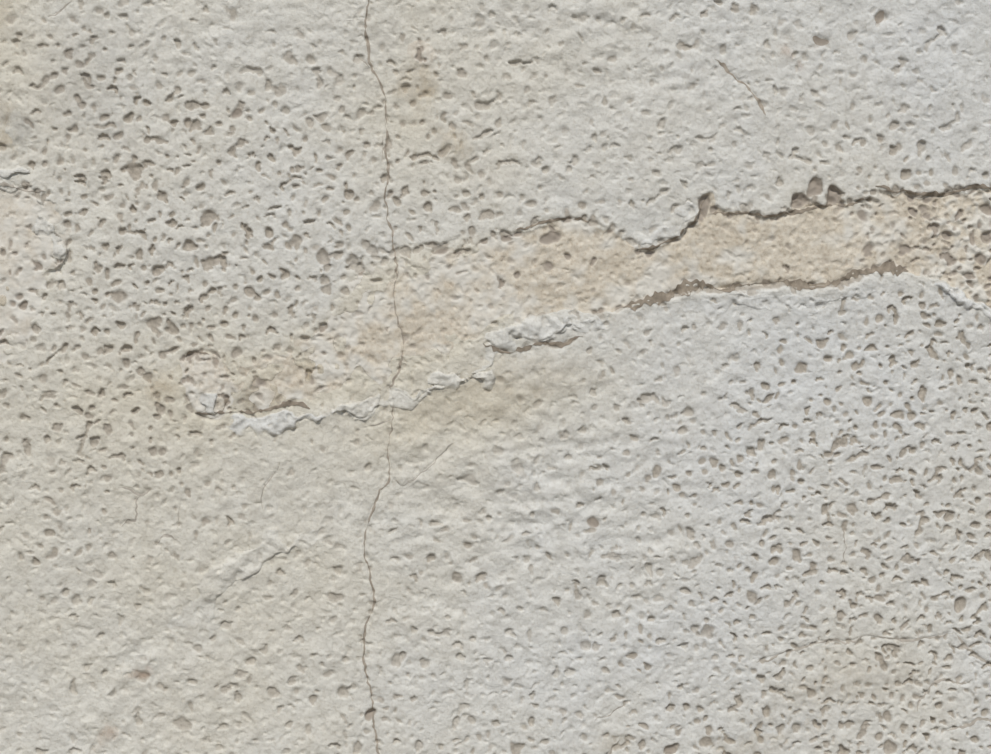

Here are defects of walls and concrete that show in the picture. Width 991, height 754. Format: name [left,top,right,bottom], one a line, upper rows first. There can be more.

crack [347,0,455,754]
spalling [180,184,991,437]